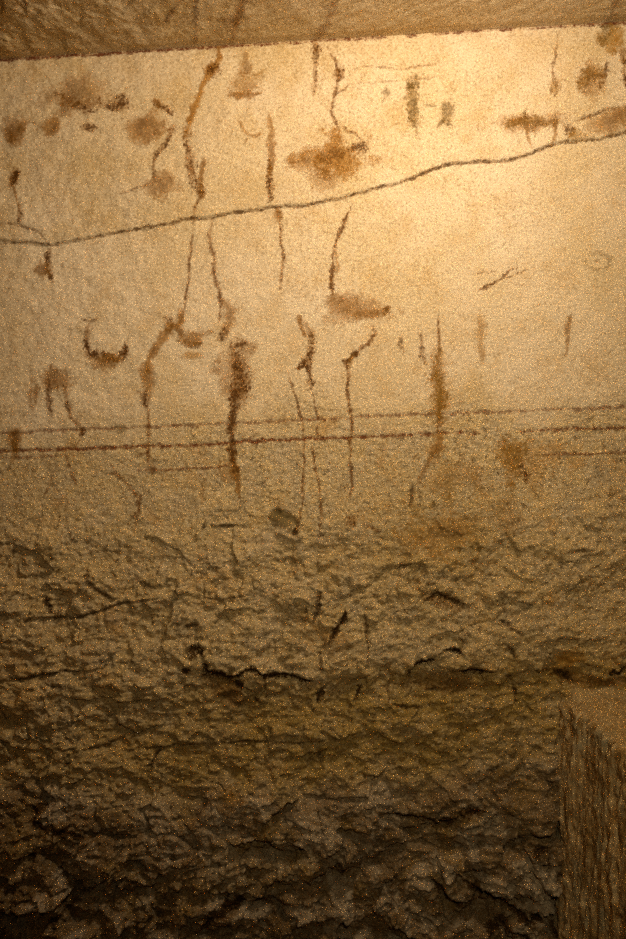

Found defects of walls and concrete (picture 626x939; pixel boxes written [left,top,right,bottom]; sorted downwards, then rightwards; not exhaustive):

crack [8,57,626,292]
crack [312,592,370,663]
crack [316,686,326,702]
crack [26,797,85,858]
crack [386,805,487,833]
crack [532,846,562,884]
crack [200,894,278,930]
crack [433,878,557,939]